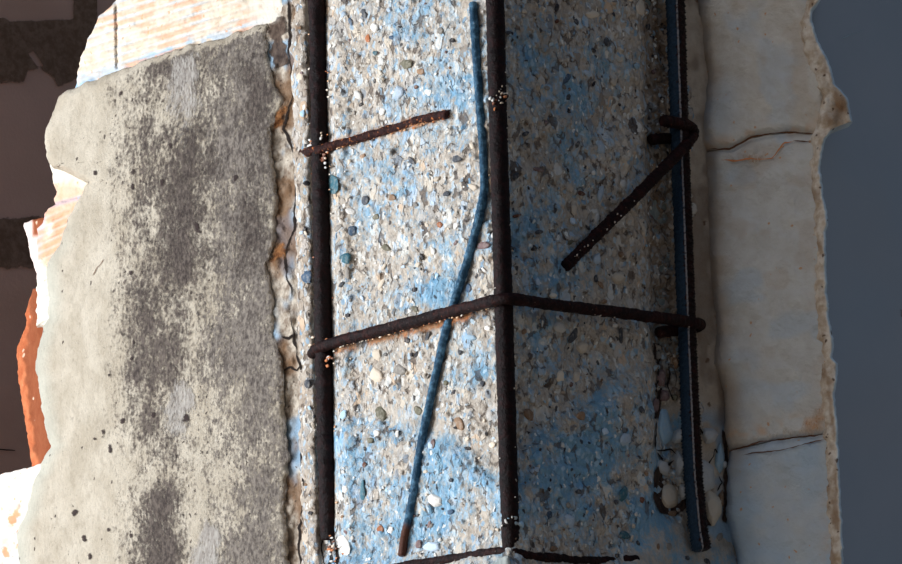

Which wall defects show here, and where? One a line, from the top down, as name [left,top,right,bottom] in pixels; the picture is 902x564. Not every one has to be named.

flaking render [0,0,97,86]
crack [273,1,294,156]
crack [712,131,812,162]
leakage [107,29,288,564]
crack [282,186,302,371]
corrosion [368,313,471,346]
spalling [289,0,737,564]
crack [731,434,824,455]
crack [297,452,339,564]